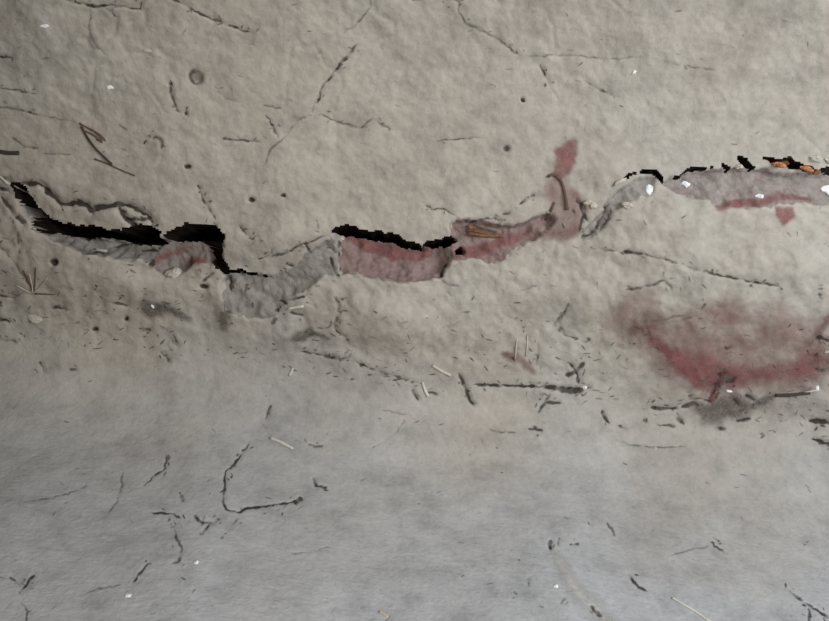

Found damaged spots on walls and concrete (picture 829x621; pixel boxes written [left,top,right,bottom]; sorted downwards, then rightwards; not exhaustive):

spalling [23,205,219,279]
crack [0,181,464,290]
spalling [222,213,552,319]
crack [573,201,611,237]
spalling [582,164,829,240]
crack [624,155,829,184]
crack [709,269,783,290]
crack [459,328,590,436]
crack [643,369,755,430]
crack [809,419,829,446]
crack [153,444,329,563]
crack [785,583,826,621]